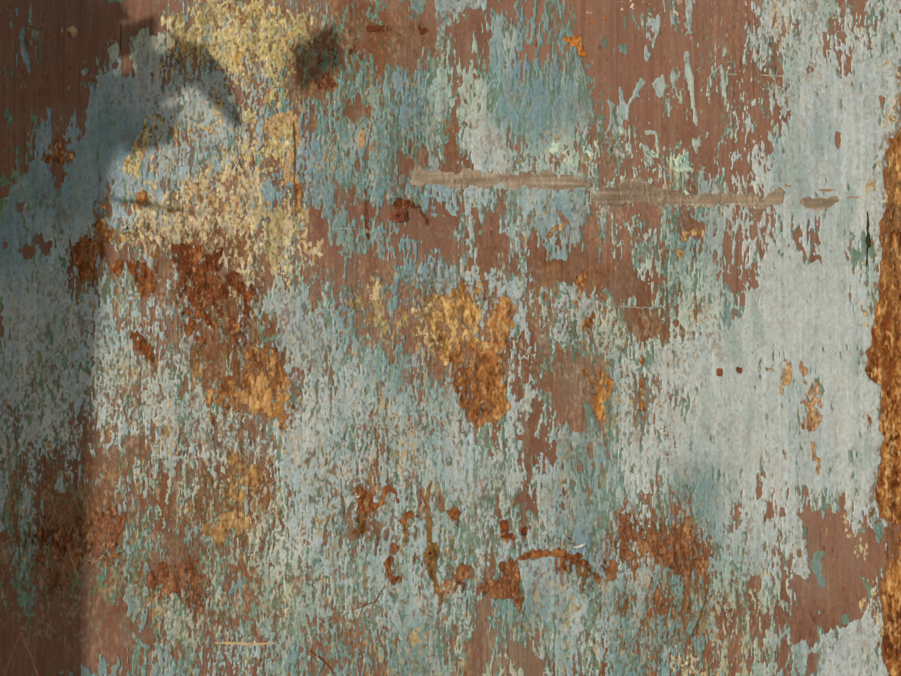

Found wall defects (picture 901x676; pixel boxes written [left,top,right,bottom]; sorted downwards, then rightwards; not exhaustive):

peeling [4,5,43,87]
peeling [361,0,387,26]
peeling [614,0,699,62]
peeling [652,51,703,126]
rust [72,190,158,297]
peeling [596,203,610,267]
rust [169,243,294,430]
rust [428,281,518,429]
rust [862,129,901,676]
rust [384,481,471,607]
rust [481,514,711,613]
peeling [81,653,129,676]